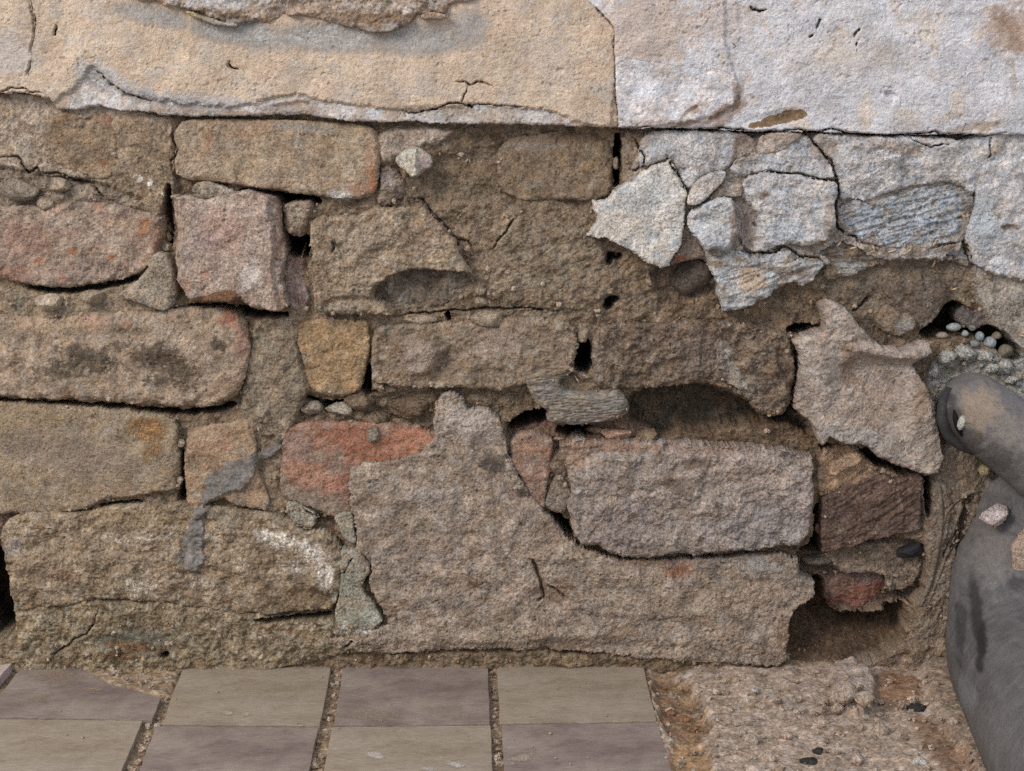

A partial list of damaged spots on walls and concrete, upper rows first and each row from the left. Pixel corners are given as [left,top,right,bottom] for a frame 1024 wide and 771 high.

crack [402,81,523,114]
crack [622,126,1005,248]
spalling [606,252,622,264]
crack [744,245,823,262]
spalling [602,295,619,309]
spalling [786,574,905,662]